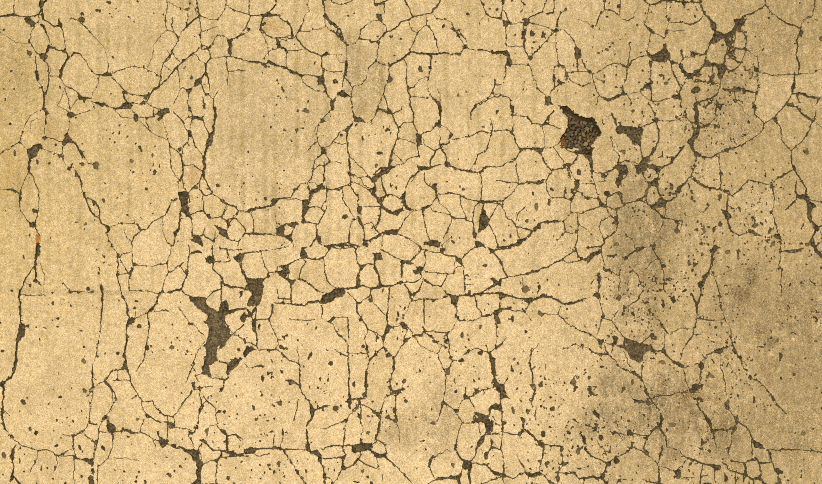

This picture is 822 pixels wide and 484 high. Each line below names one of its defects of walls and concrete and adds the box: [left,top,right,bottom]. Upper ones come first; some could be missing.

crack [4,143,51,237]
crack [0,0,109,134]
crack [42,129,86,171]
crack [0,170,379,484]
spalling [245,284,264,306]
crack [91,0,721,484]
spalling [511,132,822,484]
crack [649,249,748,398]
crack [597,0,822,259]
spalling [673,63,767,154]
crack [769,205,804,296]
crack [693,397,822,484]